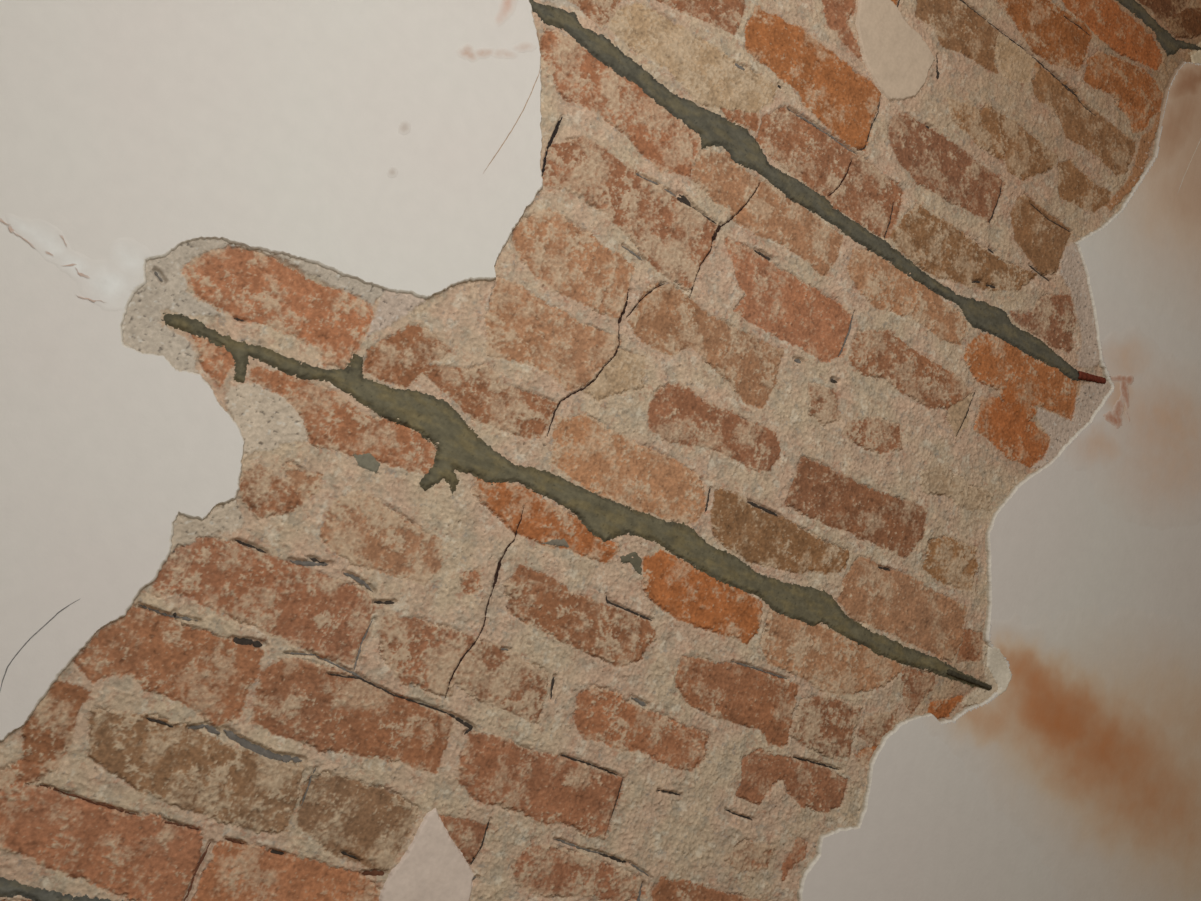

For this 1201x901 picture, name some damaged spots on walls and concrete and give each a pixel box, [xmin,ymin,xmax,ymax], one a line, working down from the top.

crack [547,181,761,437]
spalling [533,0,1201,664]
spalling [0,680,211,901]
spalling [87,708,419,876]
spalling [151,536,376,679]
spalling [73,605,473,775]
spalling [379,613,548,724]
crack [445,508,524,698]
spalling [456,731,623,840]
spalling [736,748,848,813]
spalling [675,609,935,762]
corrosion [919,605,1201,901]